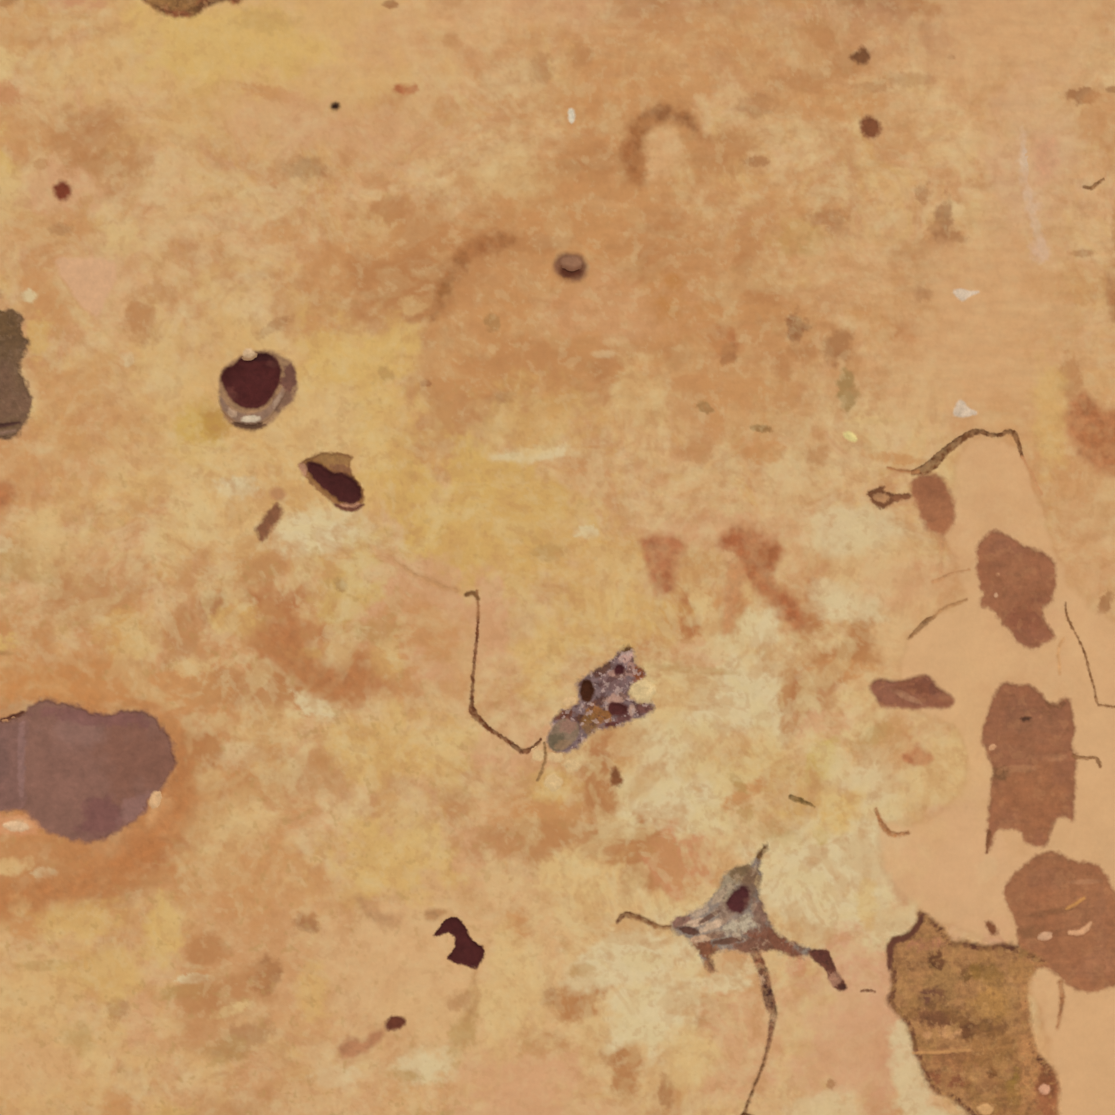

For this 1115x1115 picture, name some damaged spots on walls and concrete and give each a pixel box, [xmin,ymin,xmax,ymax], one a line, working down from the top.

spalling [140,0,247,21]
spalling [0,305,35,443]
crack [884,427,1044,497]
spalling [973,527,1059,651]
crack [462,588,549,783]
spalling [543,642,657,756]
spalling [867,672,957,713]
crack [1054,600,1115,710]
spalling [0,694,180,846]
spalling [882,679,1115,1115]
spalling [613,840,849,1115]